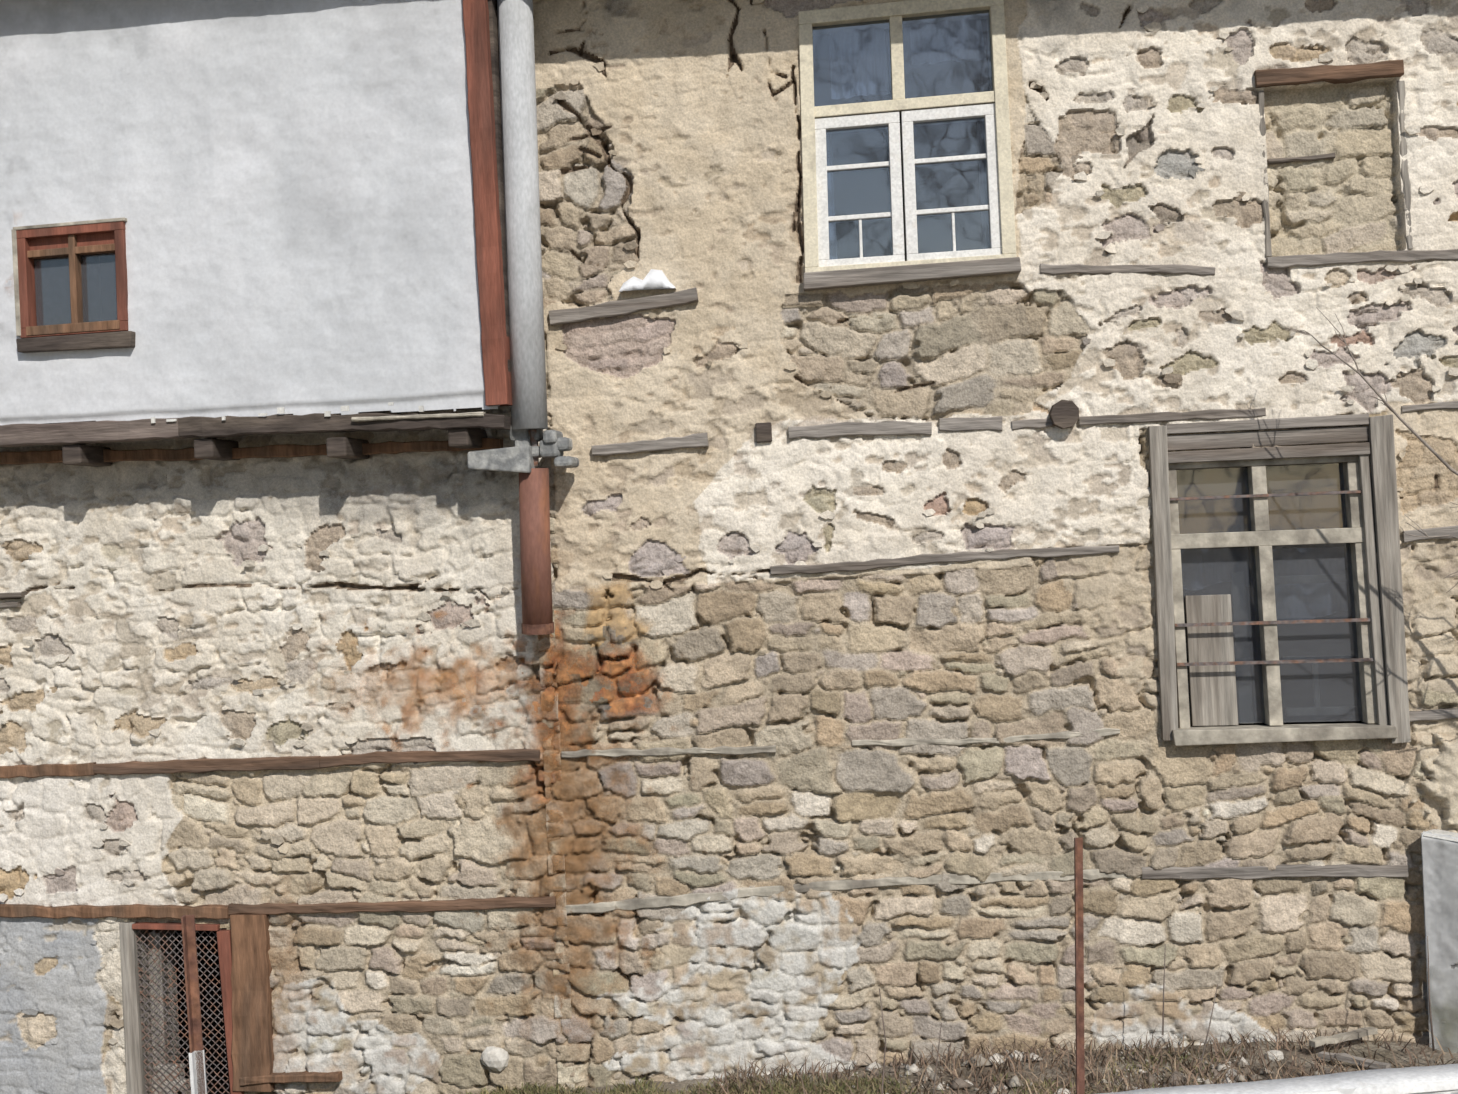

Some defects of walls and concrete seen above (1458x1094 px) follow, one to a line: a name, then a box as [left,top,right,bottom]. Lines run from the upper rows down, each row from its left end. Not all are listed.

crack [727,0,804,283]
spalling [536,79,676,379]
spalling [1260,260,1301,300]
spalling [780,279,1295,422]
spalling [1278,264,1458,415]
spalling [1395,429,1458,514]
crack [0,583,75,600]
spalling [214,516,273,567]
crack [158,581,510,596]
spalling [627,516,692,582]
rust [532,585,653,757]
spalling [83,790,148,886]